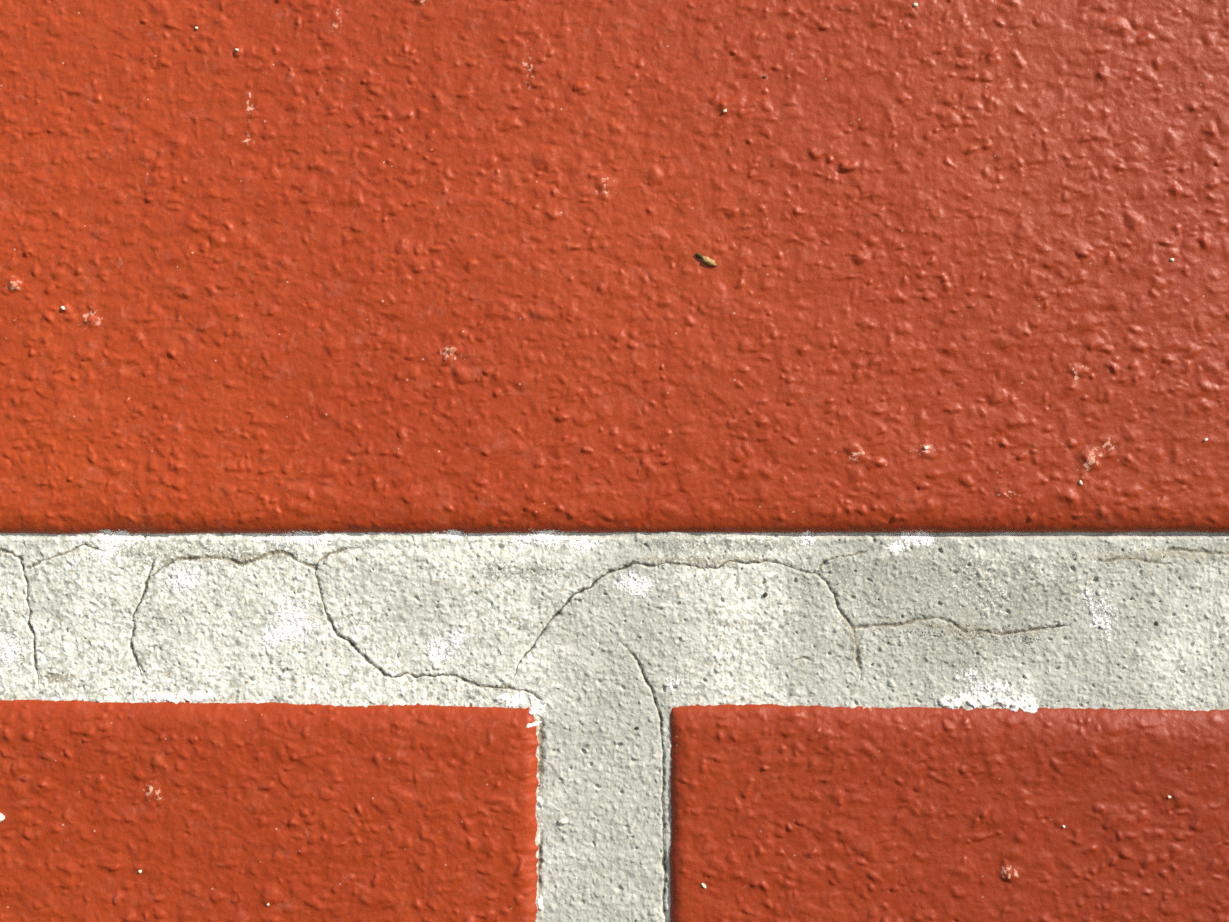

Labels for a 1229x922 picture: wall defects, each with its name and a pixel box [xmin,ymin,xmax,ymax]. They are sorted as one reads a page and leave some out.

crack [0,544,98,686]
crack [130,545,1068,793]
crack [1094,545,1229,566]
crack [621,642,667,922]
crack [536,835,544,887]